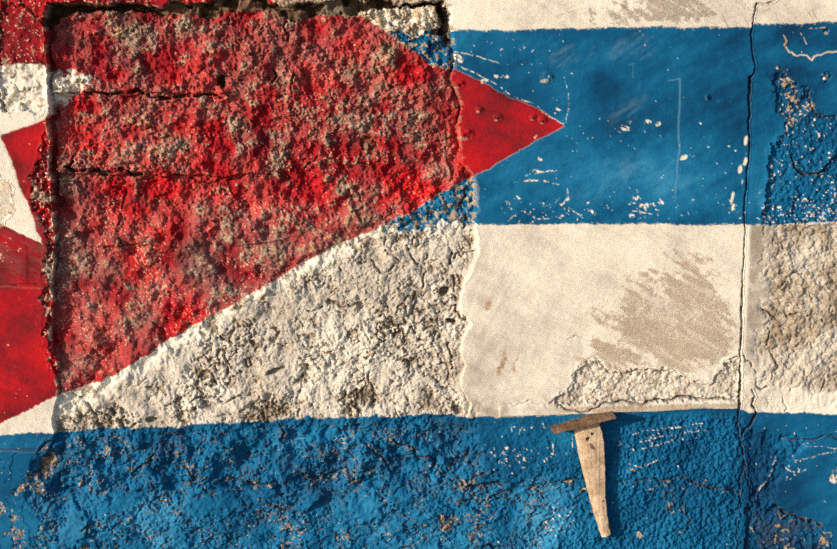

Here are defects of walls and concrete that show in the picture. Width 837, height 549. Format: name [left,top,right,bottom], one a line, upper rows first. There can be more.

spalling [0,0,455,117]
spalling [549,249,739,408]
crack [616,0,837,549]
spalling [751,70,837,393]
spalling [0,419,588,549]